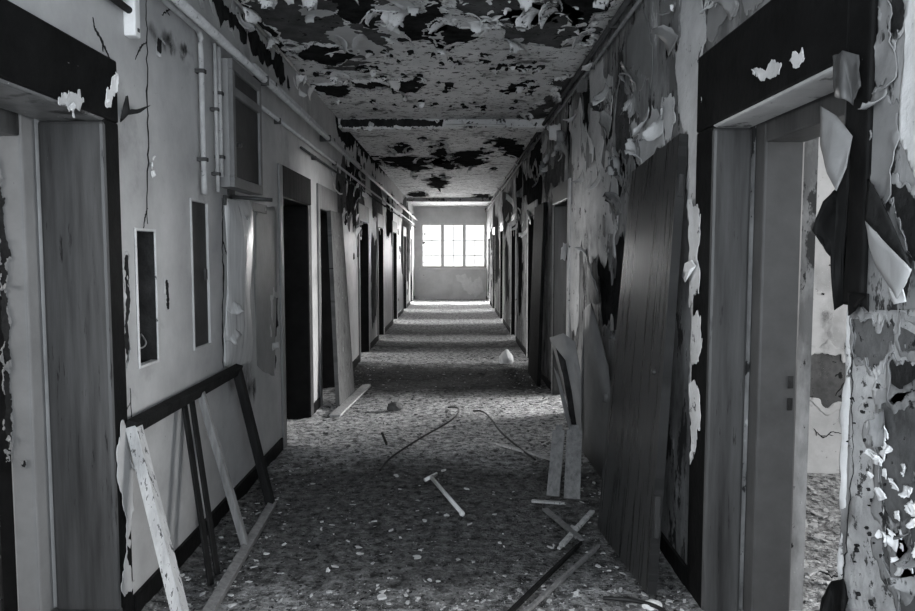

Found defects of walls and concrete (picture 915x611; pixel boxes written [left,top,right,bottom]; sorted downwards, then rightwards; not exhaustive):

peeling [0,169,27,469]
peeling [58,89,84,118]
peeling [105,72,150,122]
peeling [199,0,763,464]
peeling [751,47,805,81]
peeling [810,0,915,611]